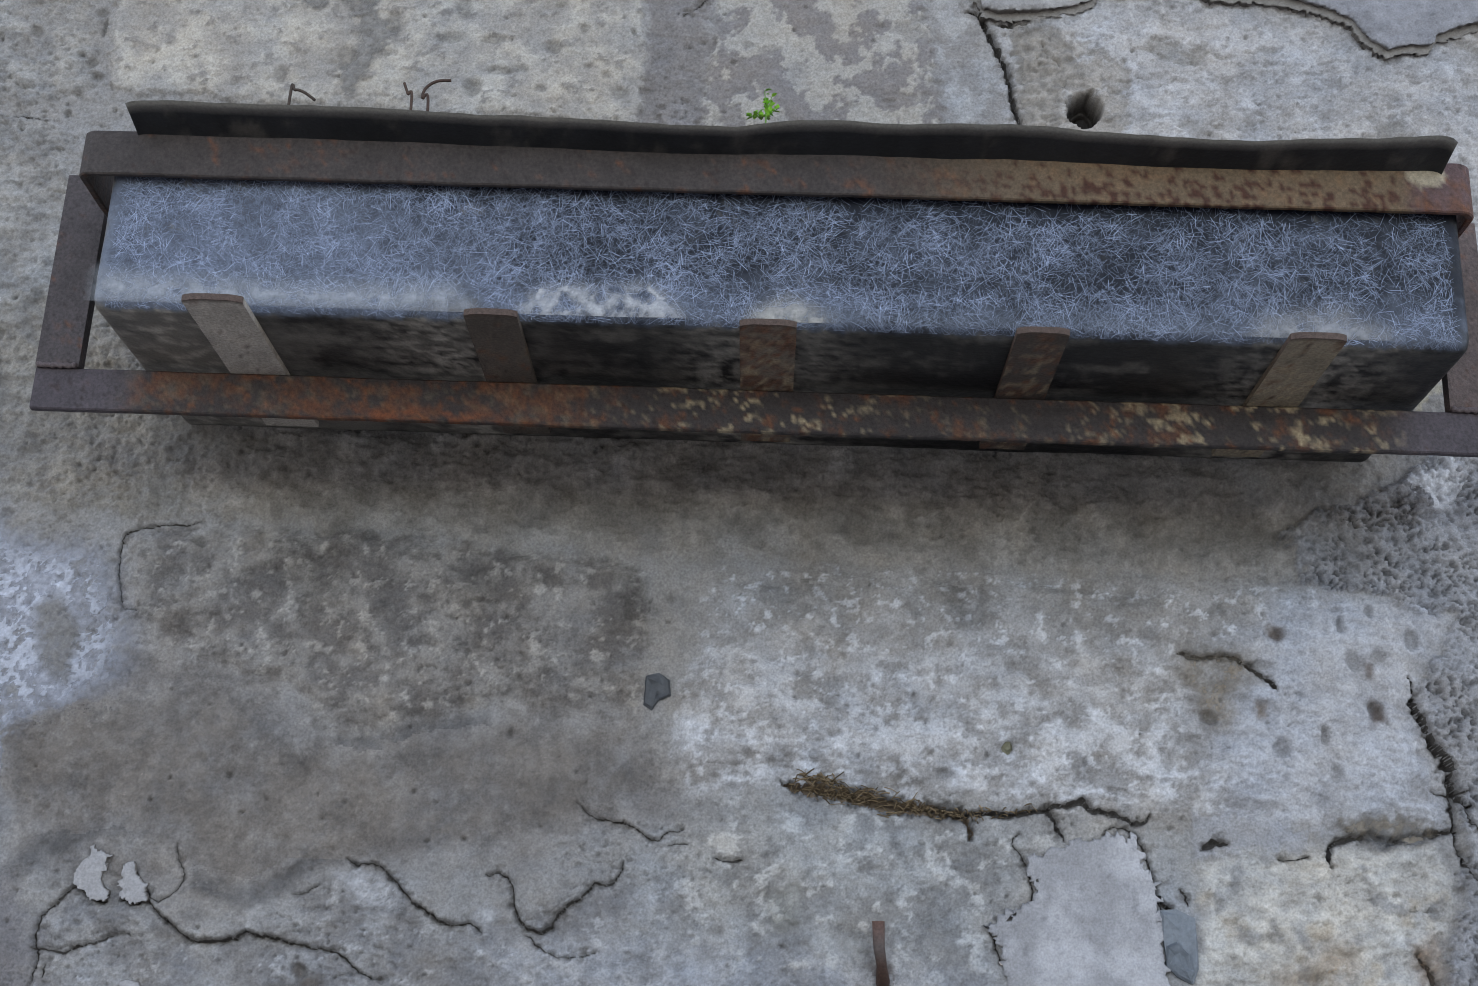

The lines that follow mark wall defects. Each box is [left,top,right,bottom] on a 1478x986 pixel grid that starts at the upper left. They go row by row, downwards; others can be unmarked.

crack [968,13,1043,125]
damp [0,536,118,742]
crack [1177,651,1277,689]
crack [1278,677,1478,880]
peeling [73,844,150,905]
crack [31,846,375,981]
crack [348,859,482,933]
crack [485,865,623,959]
crack [576,802,743,863]
crack [781,782,1188,910]
crack [1201,839,1228,851]
crack [1416,957,1436,986]